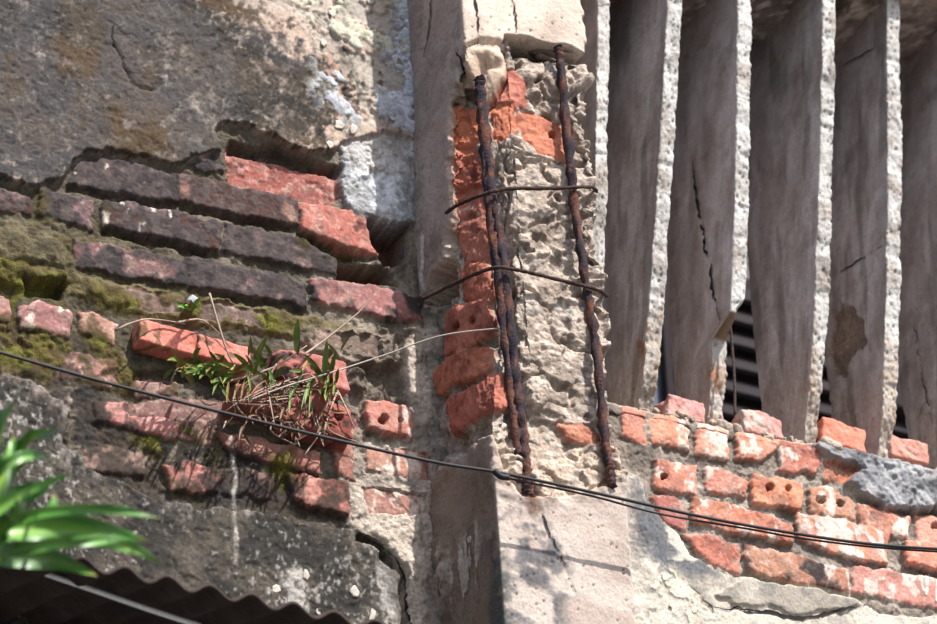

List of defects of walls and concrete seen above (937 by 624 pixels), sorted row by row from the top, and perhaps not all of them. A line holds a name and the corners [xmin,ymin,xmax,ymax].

crack [111,24,155,90]
leakage [0,0,370,187]
crack [455,0,480,78]
spalling [0,0,611,624]
crack [692,161,720,320]
spalling [828,302,868,383]
spalling [604,391,937,624]